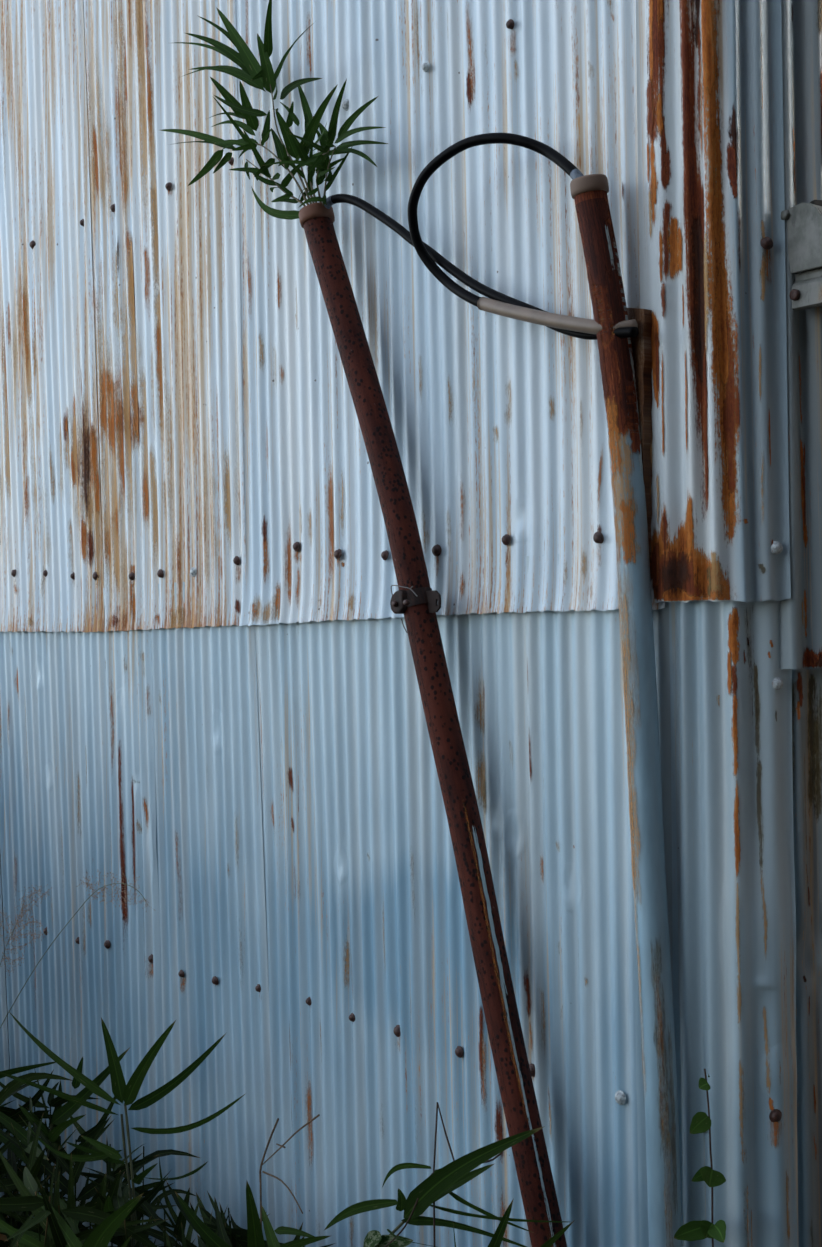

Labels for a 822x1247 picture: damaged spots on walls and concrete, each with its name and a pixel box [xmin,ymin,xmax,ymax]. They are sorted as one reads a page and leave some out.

corrosion [25,0,172,628]
corrosion [761,220,770,301]
corrosion [2,279,36,488]
corrosion [759,347,771,508]
corrosion [210,464,241,580]
corrosion [235,531,300,621]
corrosion [328,472,344,571]
corrosion [574,0,749,1023]
corrosion [796,590,822,720]
corrosion [110,689,149,920]
corrosion [524,974,545,1043]